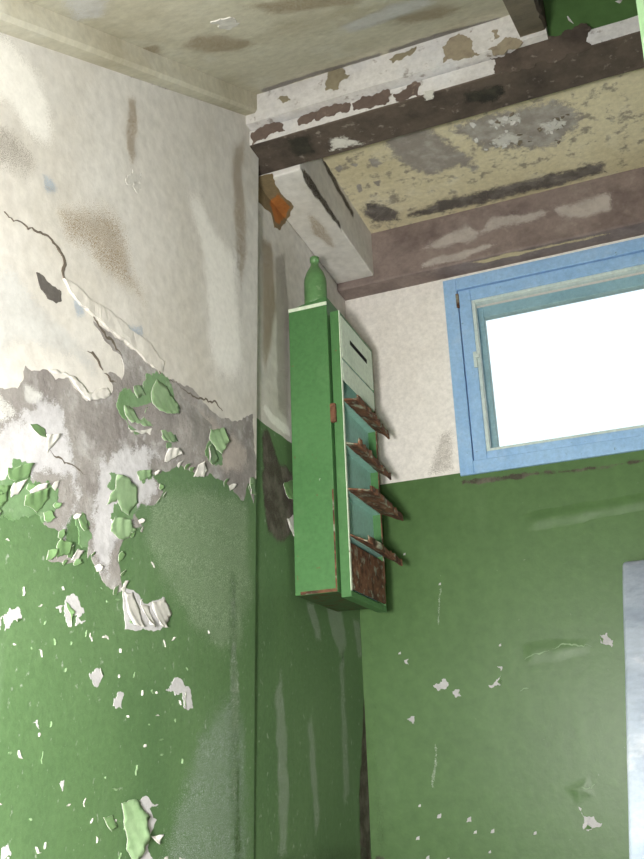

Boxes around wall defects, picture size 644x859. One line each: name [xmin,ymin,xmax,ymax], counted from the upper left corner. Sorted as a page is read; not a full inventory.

peeling [325,68,350,91]
peeling [297,81,436,126]
peeling [389,47,417,63]
peeling [442,23,591,75]
peeling [250,122,285,146]
peeling [329,137,366,152]
corrosion [258,173,294,230]
water stain [302,170,341,248]
water stain [286,134,607,224]
crack [4,211,223,411]
peeling [0,321,257,631]
peeling [103,796,164,859]